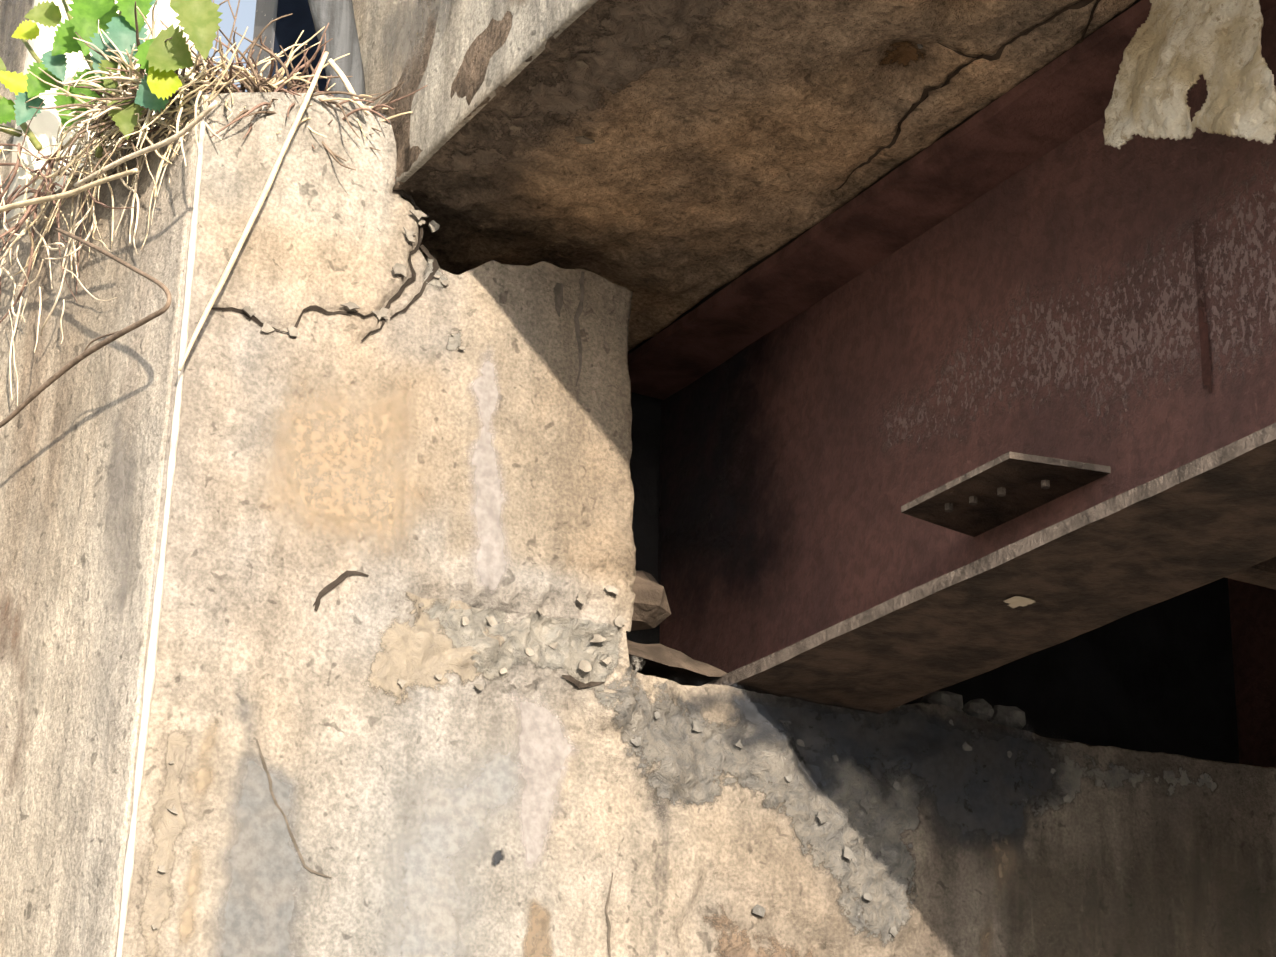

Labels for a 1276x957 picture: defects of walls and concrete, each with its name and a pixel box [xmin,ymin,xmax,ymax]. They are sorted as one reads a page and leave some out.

crack [836,0,1101,190]
crack [211,189,440,341]
leakage [654,796,667,823]
leakage [674,687,1276,957]